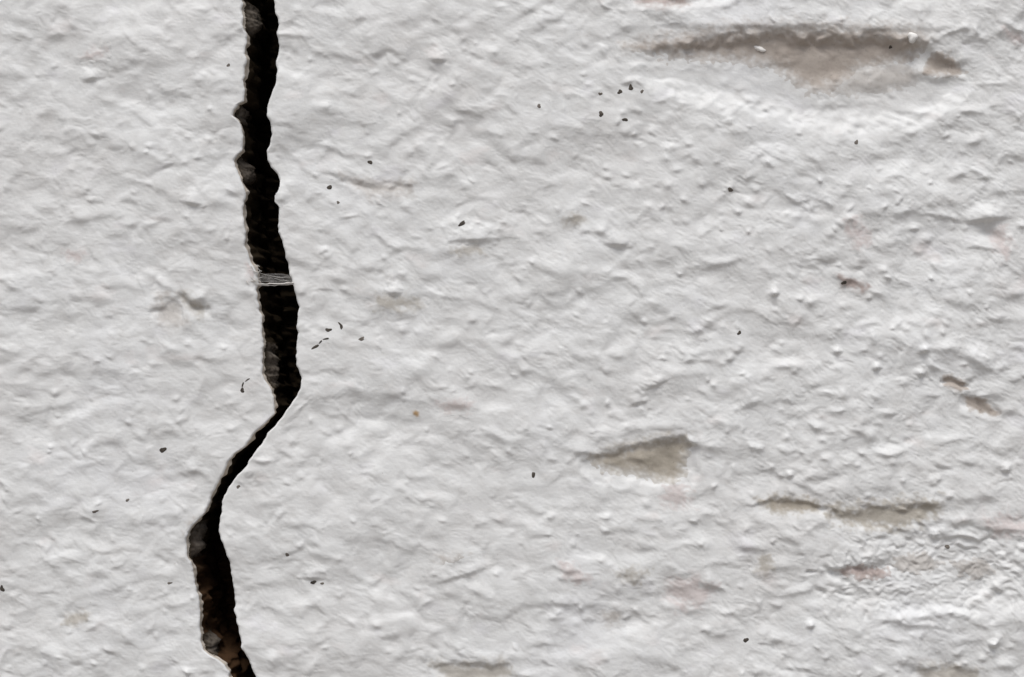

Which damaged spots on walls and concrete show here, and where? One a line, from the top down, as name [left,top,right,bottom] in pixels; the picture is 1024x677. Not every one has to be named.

spalling [609,0,978,152]
crack [186,0,302,677]
spalling [577,424,705,498]